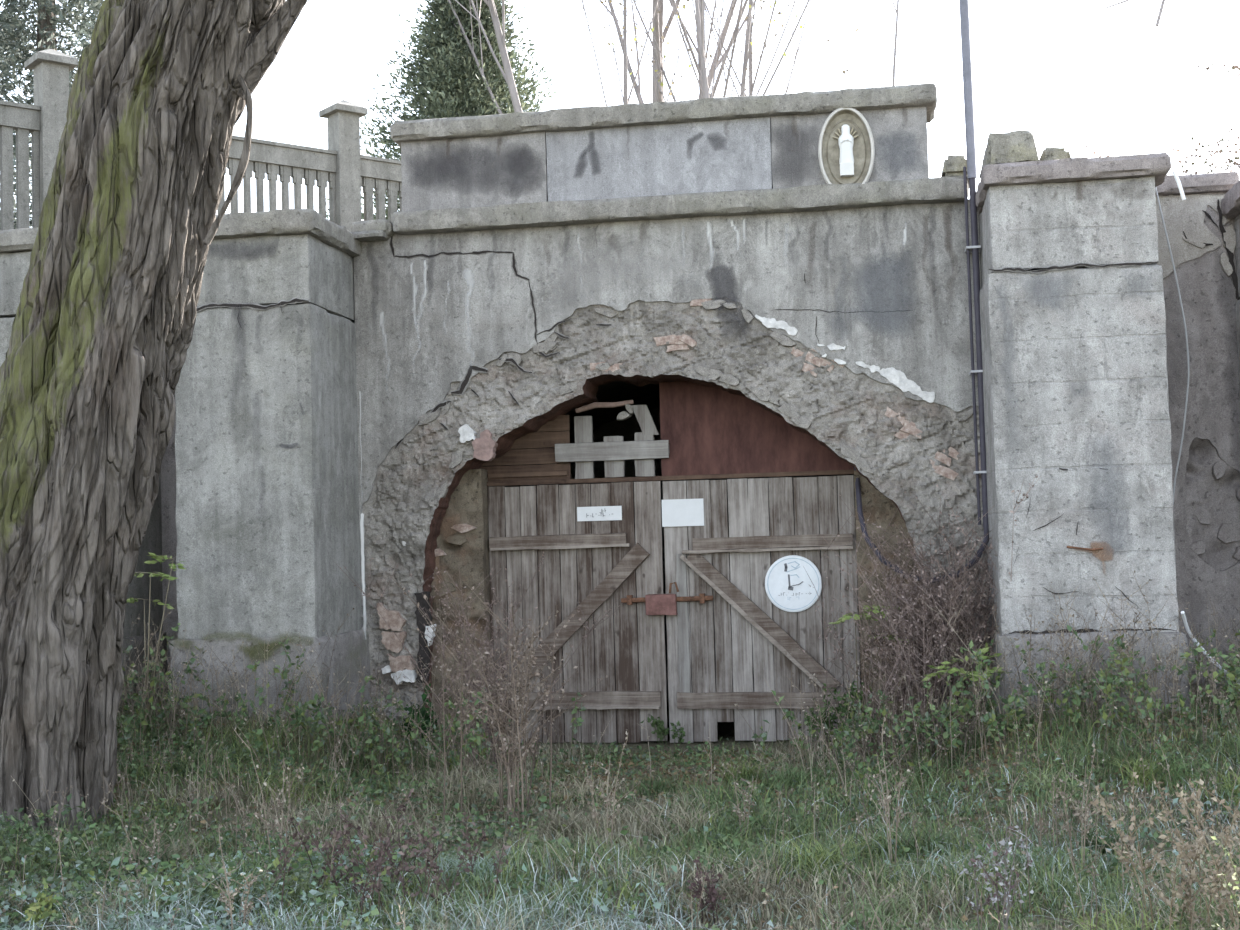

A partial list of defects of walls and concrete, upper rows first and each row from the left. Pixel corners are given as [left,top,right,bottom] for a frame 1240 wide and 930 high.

leakage [578,151,598,175]
flaking render [1156,194,1236,279]
crack [989,261,1156,274]
crack [196,297,309,328]
crack [389,236,611,430]
spalling [362,299,990,730]
rust [1071,542,1113,560]